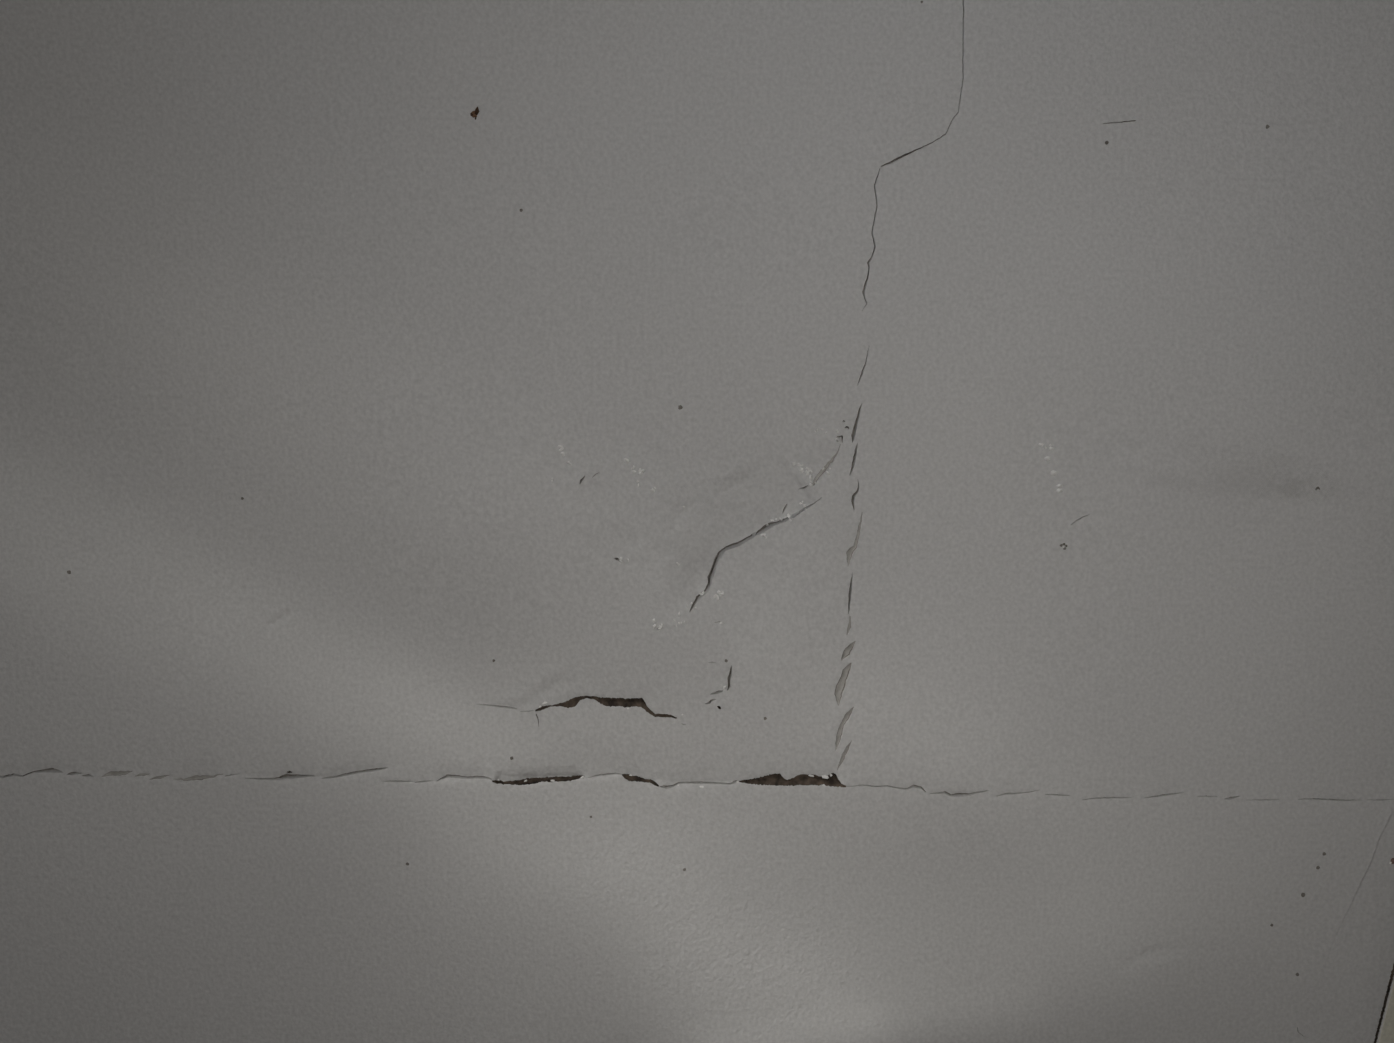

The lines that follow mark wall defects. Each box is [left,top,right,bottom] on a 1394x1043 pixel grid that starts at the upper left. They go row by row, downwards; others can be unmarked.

crack [862,0,964,311]
crack [0,348,1394,801]